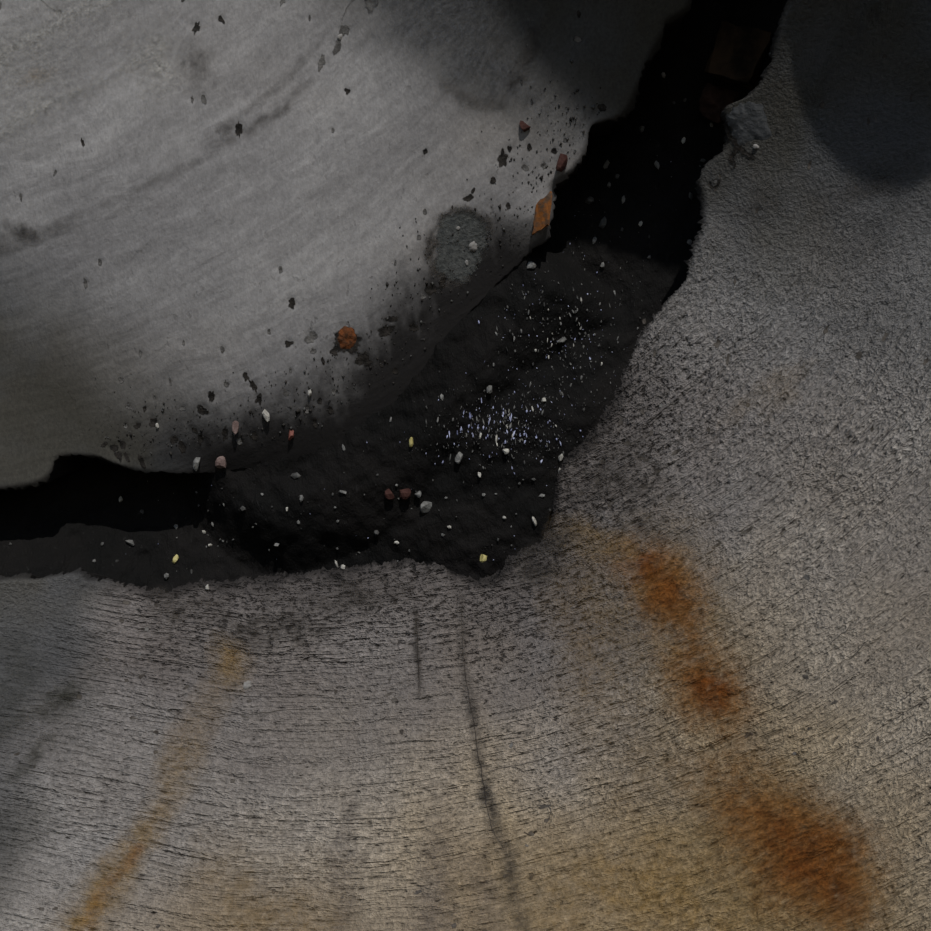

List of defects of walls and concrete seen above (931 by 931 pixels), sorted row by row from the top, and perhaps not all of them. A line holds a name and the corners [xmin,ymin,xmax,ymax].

spalling [318,25,349,71]
spalling [497,146,512,167]
spalling [722,102,772,168]
spalling [417,188,490,299]
spalling [305,326,372,366]
spalling [378,316,398,337]
spalling [197,391,215,415]
spalling [243,372,262,405]
rust [638,552,692,626]
rust [680,640,735,714]
crack [461,615,554,873]
rust [741,806,860,914]